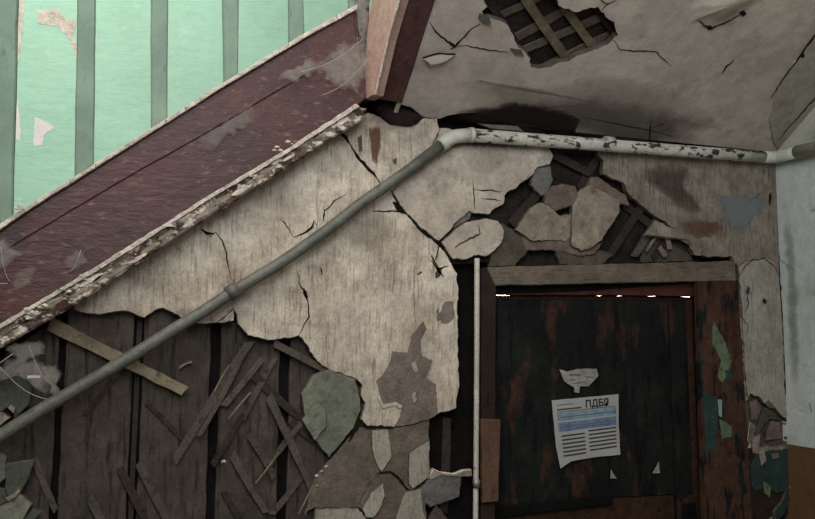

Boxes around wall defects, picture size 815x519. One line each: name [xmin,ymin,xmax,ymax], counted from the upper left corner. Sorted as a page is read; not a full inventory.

crack [430,22,506,52]
spalling [478,0,616,64]
crack [614,40,671,66]
crack [770,35,815,99]
spalling [448,103,574,132]
crack [778,98,815,140]
peeling [79,174,265,287]
crack [341,133,460,278]
spalling [438,148,699,267]
spalling [0,297,474,519]
crack [379,471,428,491]
peeling [745,396,791,519]